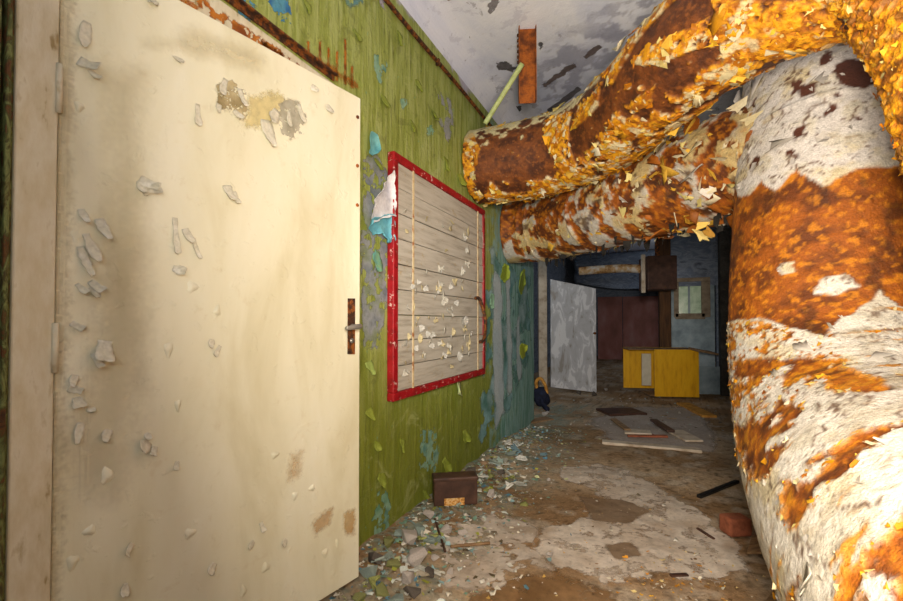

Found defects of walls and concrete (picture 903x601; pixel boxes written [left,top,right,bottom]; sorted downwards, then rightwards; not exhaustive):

peeling [76,20,103,79]
rust [180,0,300,66]
peeling [374,54,388,83]
peeling [216,77,249,119]
peeling [260,99,307,147]
peeling [444,0,903,244]
peeling [137,176,163,196]
peeling [75,218,113,298]
peeling [172,217,203,259]
peeling [500,263,526,295]
peeling [515,214,570,262]